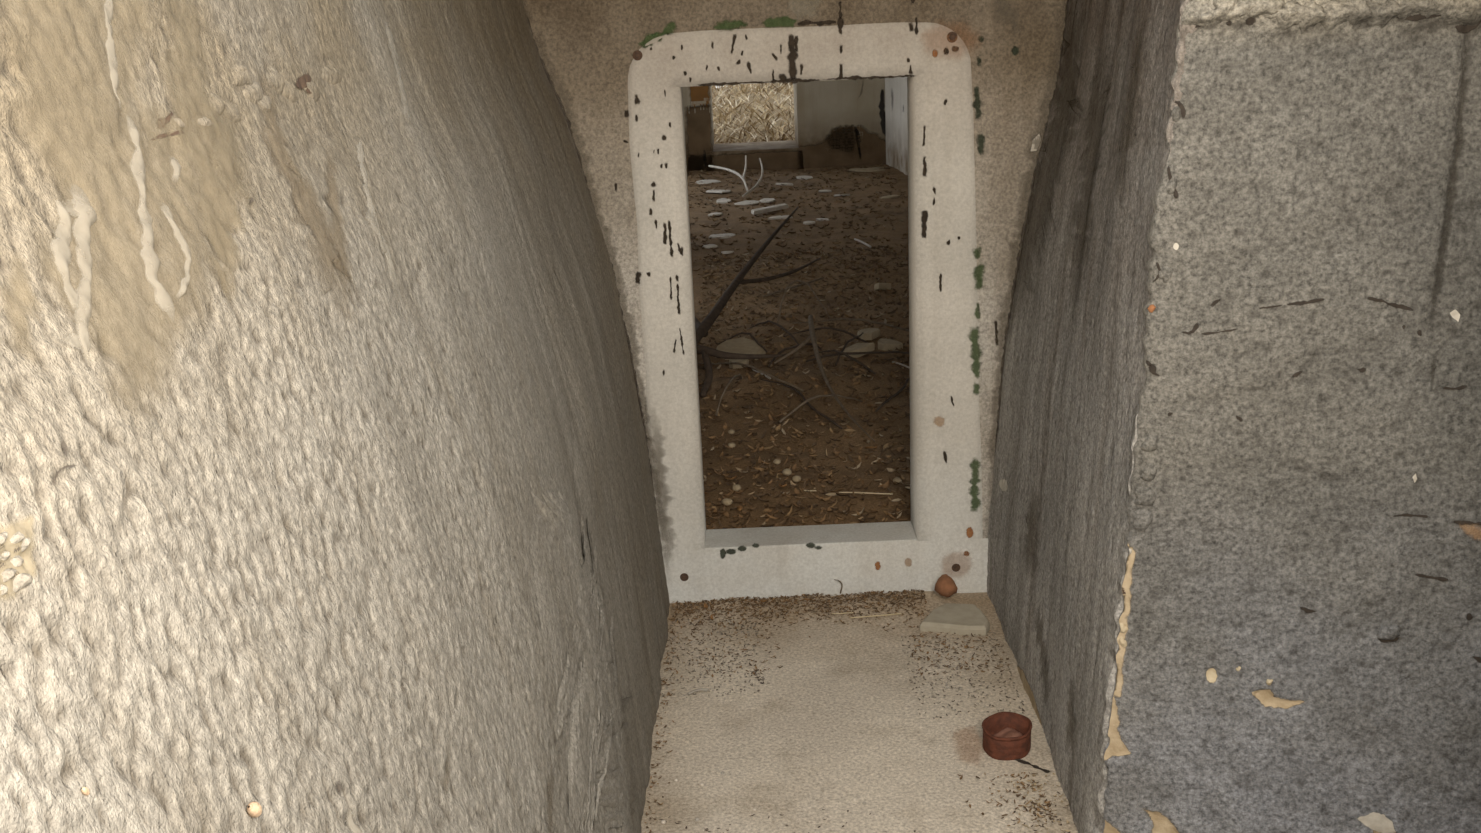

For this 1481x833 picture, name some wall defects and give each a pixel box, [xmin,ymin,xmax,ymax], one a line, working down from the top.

leakage [17,0,241,378]
spalling [1104,435,1158,760]
spalling [1252,679,1304,709]
spalling [1145,810,1179,833]
peeling [1357,812,1396,833]